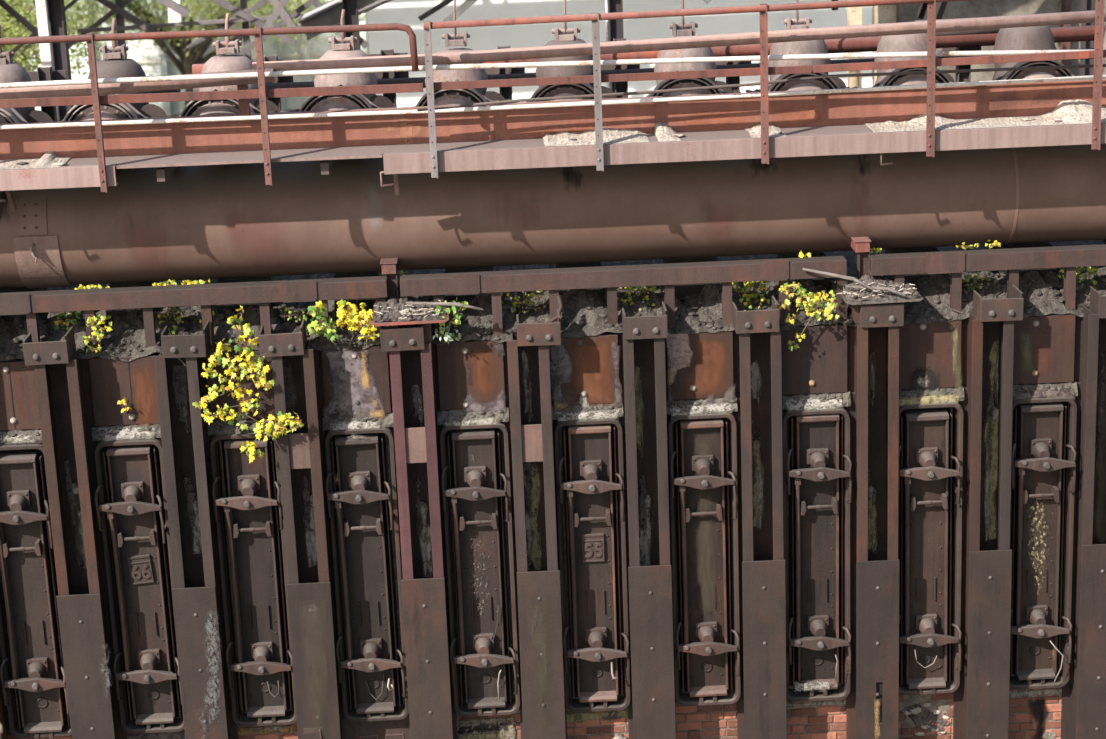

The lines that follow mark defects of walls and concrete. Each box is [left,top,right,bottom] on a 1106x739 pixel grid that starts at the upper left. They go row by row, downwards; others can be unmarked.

peeling [323,350,386,429]
corrosion [472,351,493,394]
peeling [549,342,587,410]
peeling [597,342,622,419]
spalling [666,332,693,408]
peeling [708,386,735,413]
water stain [985,342,998,540]